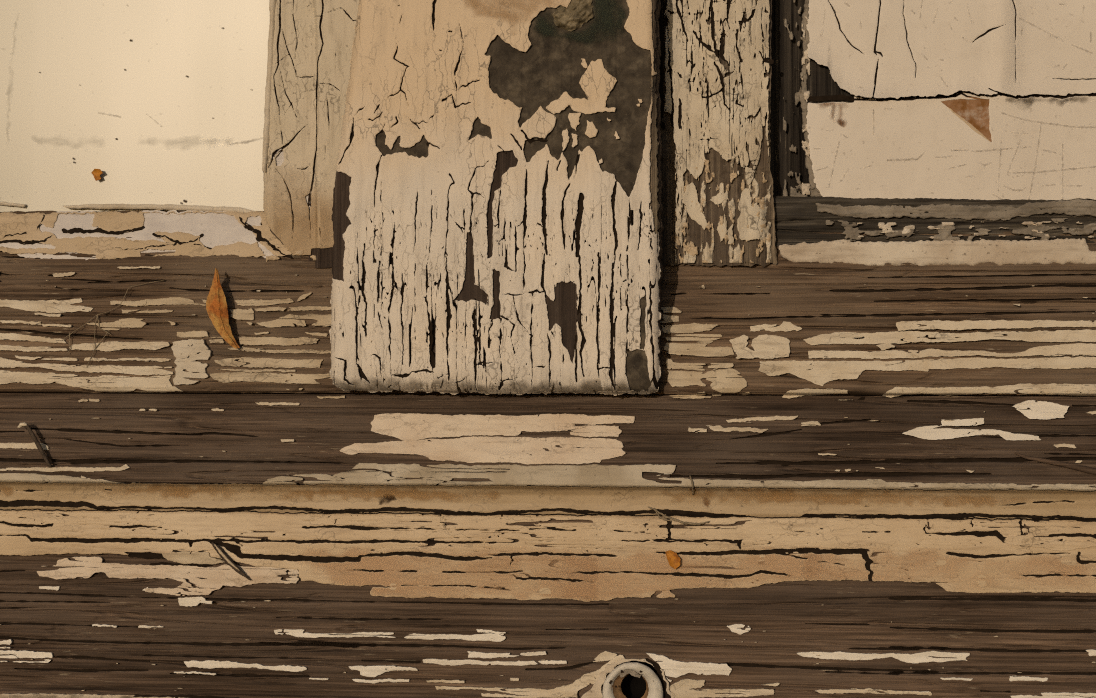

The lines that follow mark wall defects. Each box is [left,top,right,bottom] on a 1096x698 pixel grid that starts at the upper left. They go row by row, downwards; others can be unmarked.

peeling [453,0,778,322]
crack [239,0,1096,395]
peeling [0,290,345,406]
peeling [625,291,1096,399]
crack [0,428,342,464]
peeling [340,413,635,465]
crack [670,397,1096,480]
peeling [882,383,1096,420]
peeling [37,550,300,607]
crack [0,489,1096,698]
peeling [274,629,643,698]
peeling [797,651,970,663]